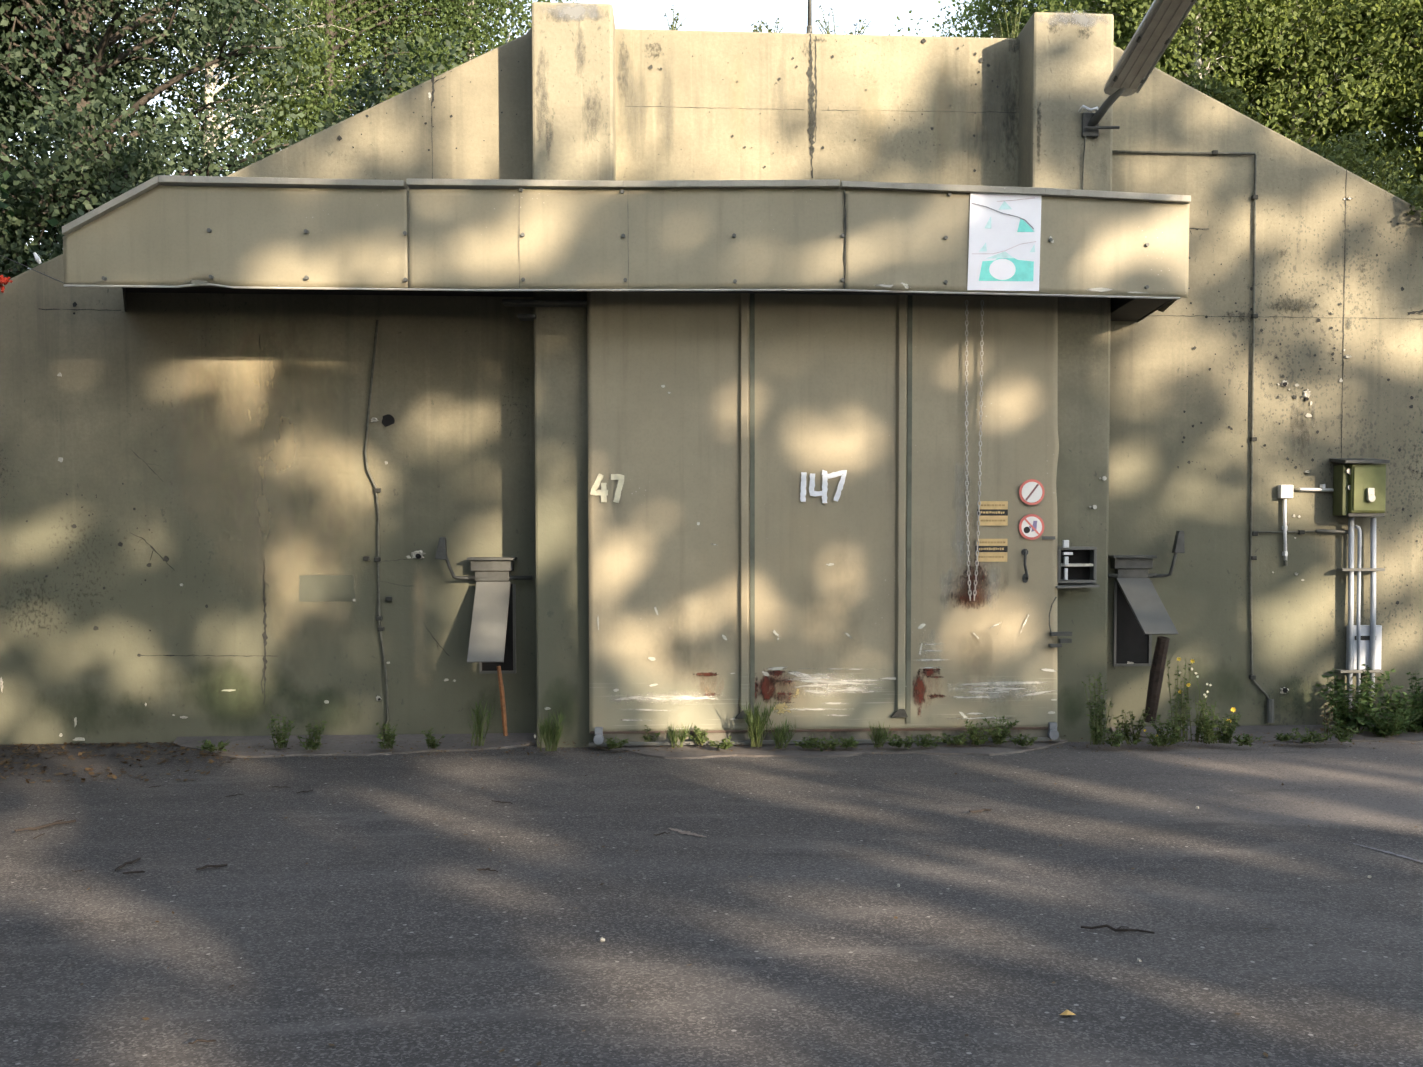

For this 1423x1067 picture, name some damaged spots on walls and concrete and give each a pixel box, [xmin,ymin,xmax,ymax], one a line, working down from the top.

rust [951,562,991,606]
peeling [918,623,945,668]
rust [755,670,792,703]
peeling [762,667,907,716]
rust [913,668,944,715]
peeling [954,668,1057,723]